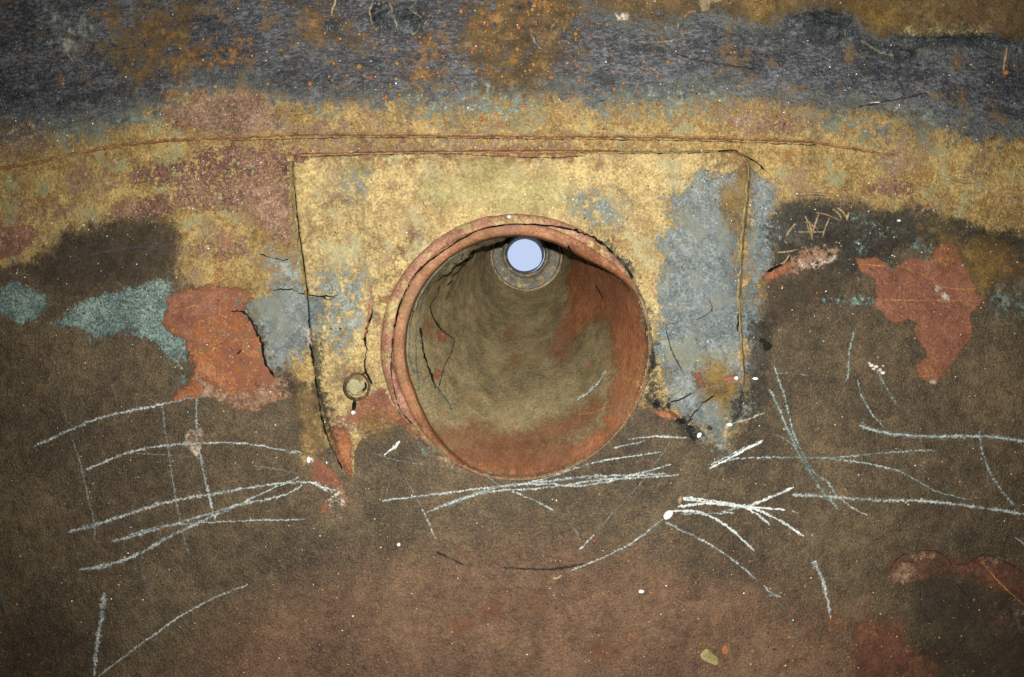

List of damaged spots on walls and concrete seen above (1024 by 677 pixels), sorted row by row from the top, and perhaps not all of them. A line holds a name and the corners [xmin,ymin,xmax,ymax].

corrosion [0,0,647,515]
crack [268,288,338,300]
crack [231,310,274,377]